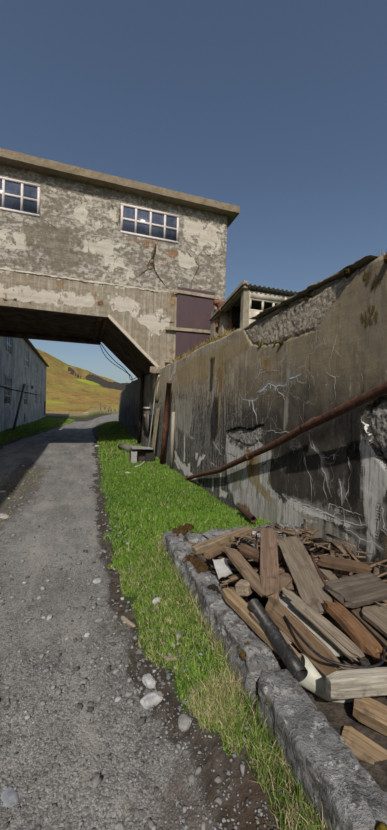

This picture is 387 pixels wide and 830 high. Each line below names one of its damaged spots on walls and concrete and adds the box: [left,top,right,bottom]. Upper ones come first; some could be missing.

peeling [0,228,29,251]
crack [2,269,117,286]
peeling [48,195,118,230]
peeling [0,238,170,336]
crack [141,244,169,291]
peeling [174,219,226,273]
water stain [210,345,225,439]
water stain [170,399,205,487]
spalling [225,425,264,446]
crack [239,336,387,556]
spalling [361,394,387,462]
water stain [212,400,387,572]